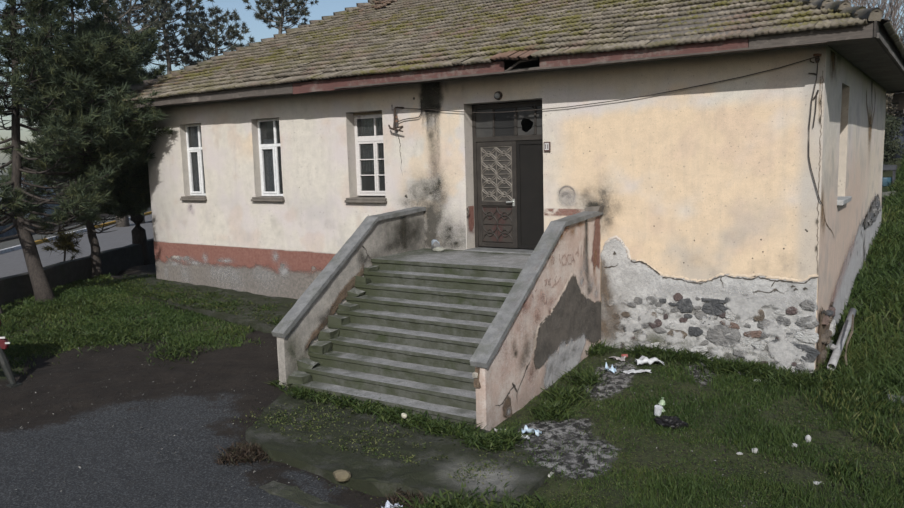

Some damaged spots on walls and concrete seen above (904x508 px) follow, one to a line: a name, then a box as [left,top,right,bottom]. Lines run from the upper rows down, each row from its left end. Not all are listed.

water stain [420,82,443,138]
water stain [388,181,462,249]
spalling [533,194,882,389]
crack [496,363,530,406]